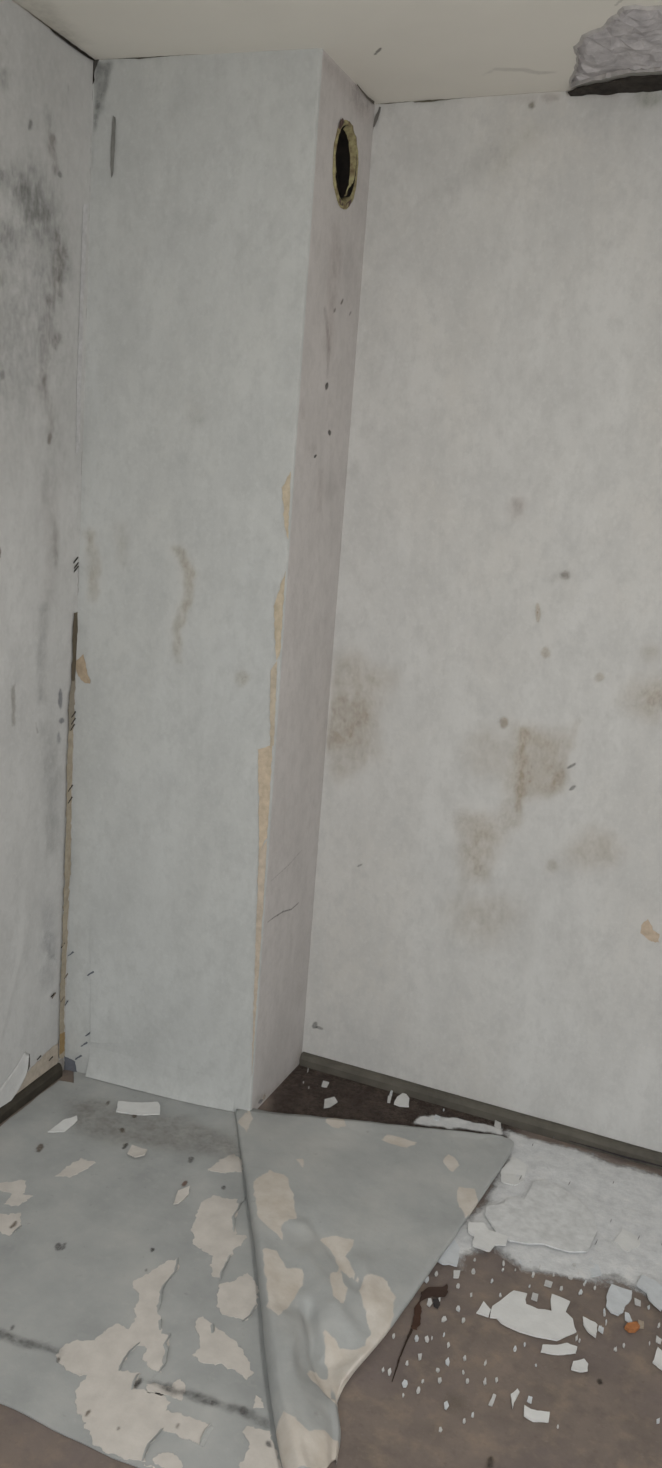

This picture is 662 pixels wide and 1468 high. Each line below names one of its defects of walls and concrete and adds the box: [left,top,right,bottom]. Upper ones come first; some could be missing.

flaking render [569,5,662,88]
peeling [0,1032,90,1107]